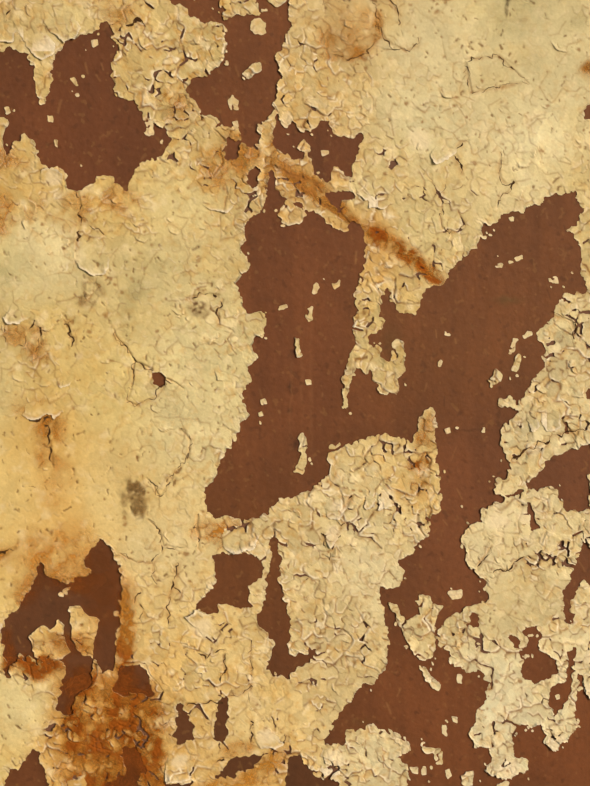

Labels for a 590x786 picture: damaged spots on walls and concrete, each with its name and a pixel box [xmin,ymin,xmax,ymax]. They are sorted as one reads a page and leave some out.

crack [334,0,419,61]
peeling [0,7,174,196]
corrosion [266,142,444,285]
crack [113,333,184,407]
peeling [159,0,590,786]
corrosion [2,642,66,681]
corrosion [15,547,86,604]
peeling [0,533,158,716]
corrosion [60,592,166,786]
crack [186,640,254,742]
crack [475,548,531,573]
peeling [0,746,51,786]